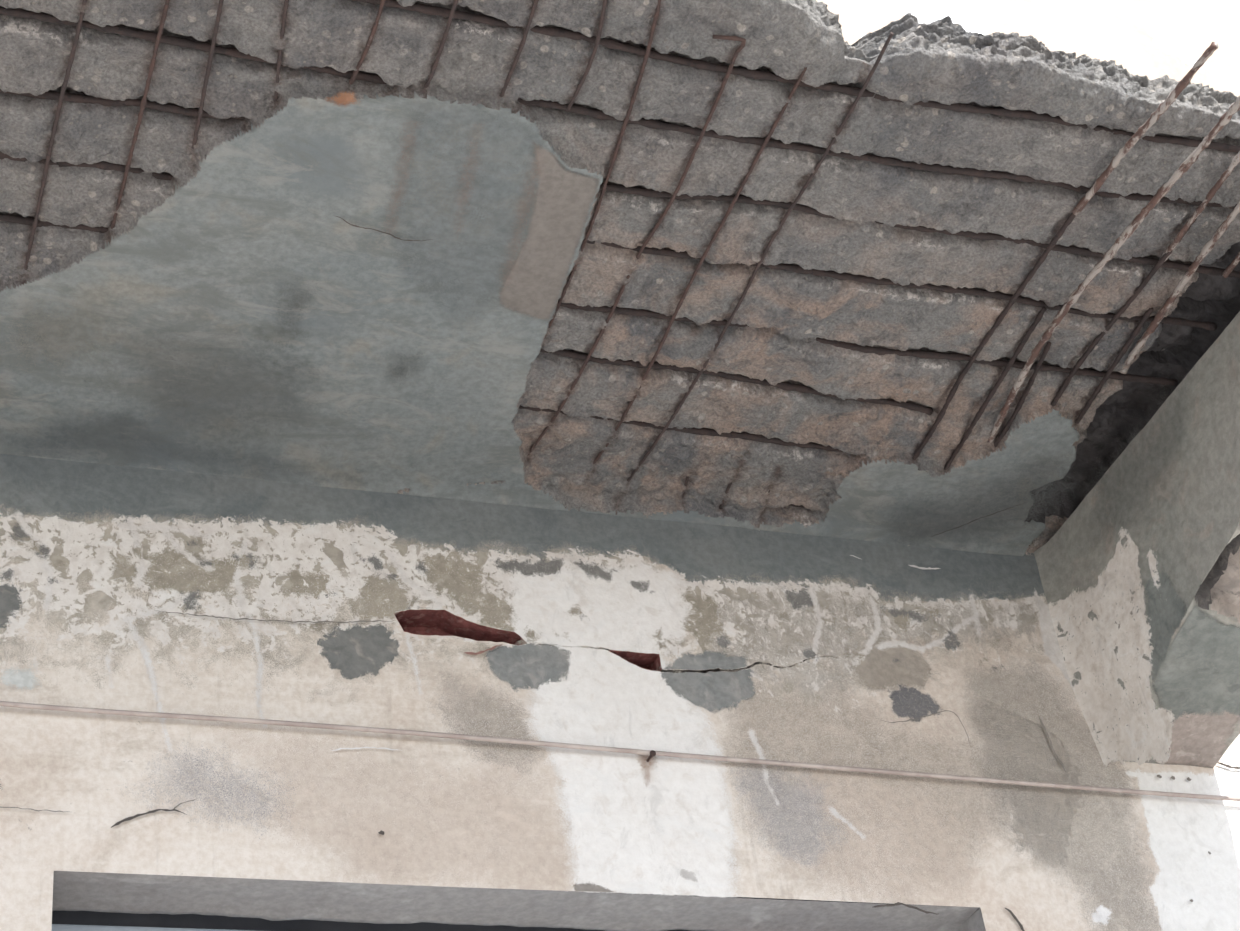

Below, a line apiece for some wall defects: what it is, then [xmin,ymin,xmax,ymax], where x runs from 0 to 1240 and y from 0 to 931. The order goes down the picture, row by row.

rust [325,91,360,107]
spalling [0,0,1240,528]
crack [154,609,837,673]
peeling [0,504,1240,781]
crack [111,799,196,828]